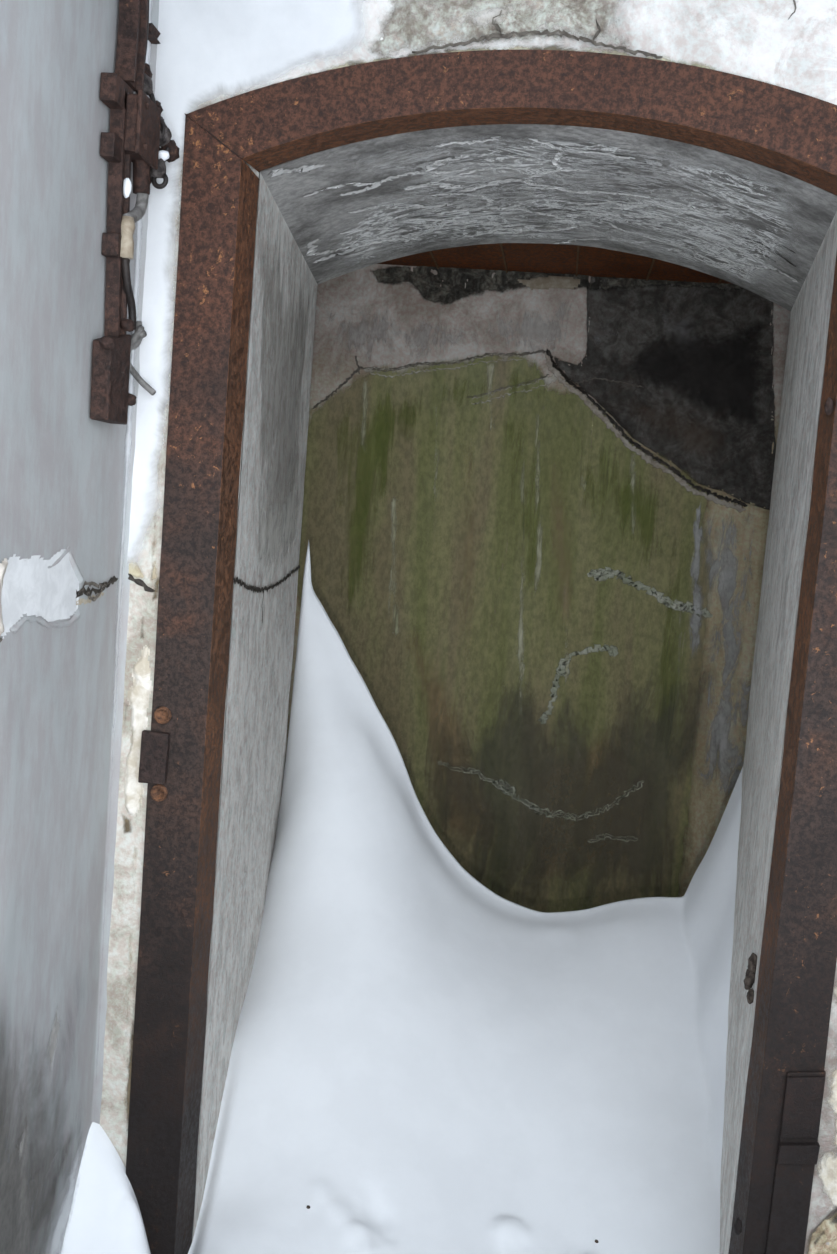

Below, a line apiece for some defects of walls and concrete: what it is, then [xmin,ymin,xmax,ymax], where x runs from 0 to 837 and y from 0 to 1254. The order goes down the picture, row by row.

corrosion [326,46,629,71]
spalling [371,0,625,59]
leakage [304,136,798,284]
crack [312,349,748,512]
peeling [0,547,83,639]
crack [75,559,156,605]
crack [233,564,300,623]
leakage [587,508,751,794]
leakage [437,644,692,895]
corrosion [126,1029,134,1131]
leakage [0,1074,67,1254]
peeling [807,1070,837,1254]